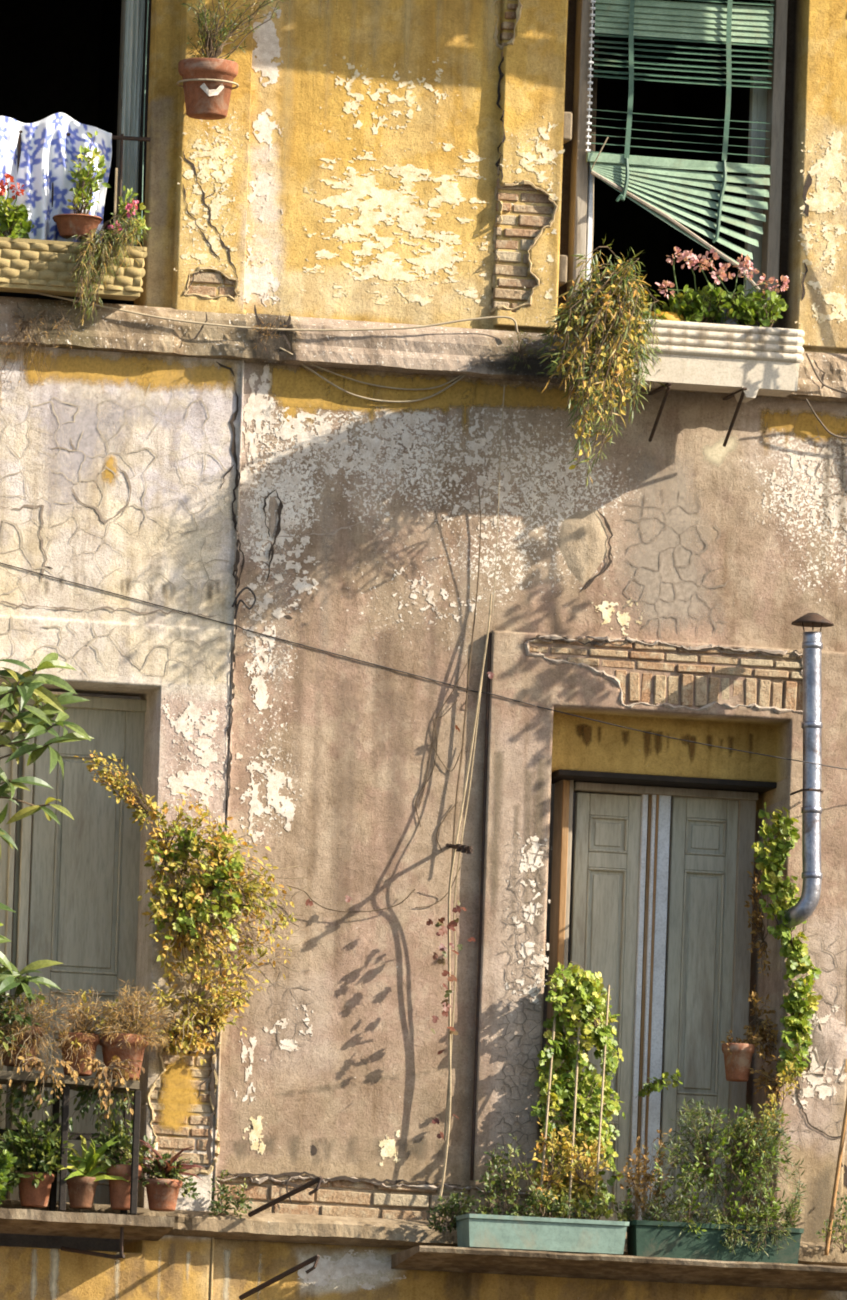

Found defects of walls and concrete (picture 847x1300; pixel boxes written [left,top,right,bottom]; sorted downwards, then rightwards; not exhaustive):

peeling [252,7,284,87]
peeling [174,108,283,307]
crack [182,151,291,355]
peeling [302,53,565,315]
peeling [795,129,847,324]
crack [0,362,283,813]
peeling [157,364,594,848]
crack [526,488,800,657]
spalling [524,594,803,714]
crack [197,1014,461,1204]
crack [492,841,548,1179]
crack [792,922,847,1187]